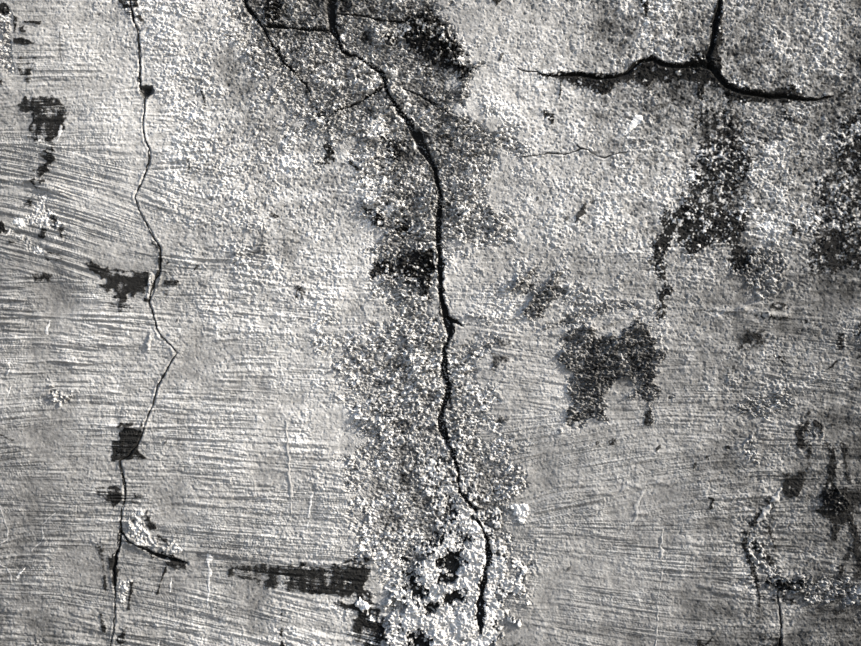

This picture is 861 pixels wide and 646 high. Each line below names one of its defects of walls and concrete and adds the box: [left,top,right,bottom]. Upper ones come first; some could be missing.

leakage [380,8,473,79]
crack [518,0,834,101]
leakage [17,95,69,207]
leakage [318,140,335,164]
leakage [537,0,847,319]
leakage [789,107,861,282]
leakage [86,241,179,313]
crack [110,2,188,646]
crack [242,0,493,635]
leakage [370,245,437,302]
leakage [111,422,146,462]
leakage [220,399,534,646]